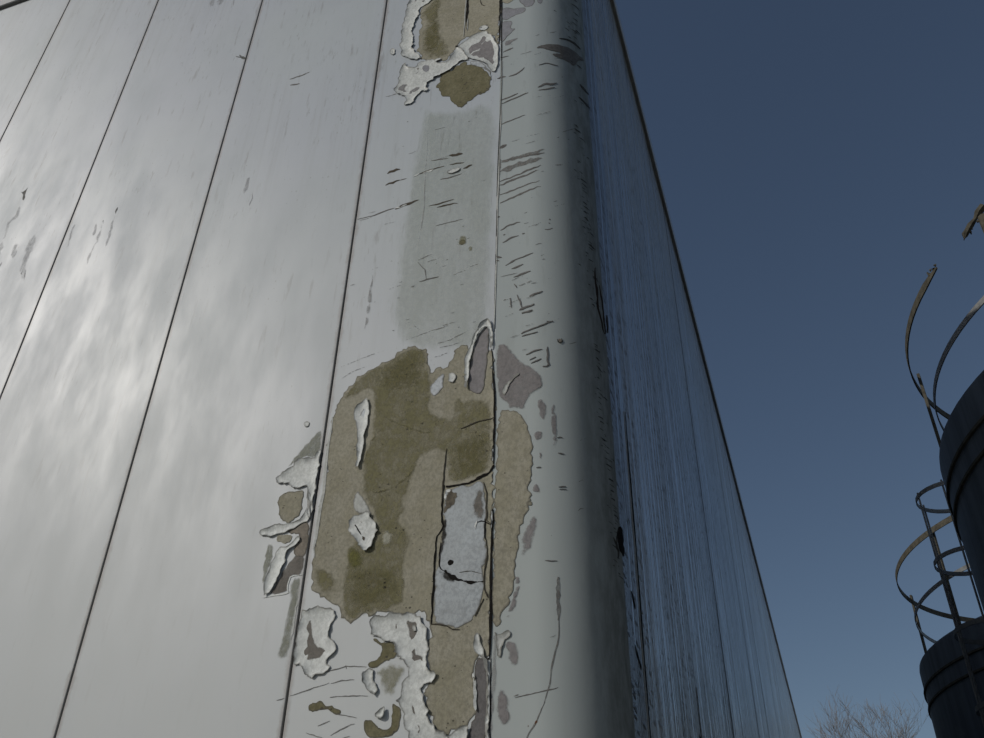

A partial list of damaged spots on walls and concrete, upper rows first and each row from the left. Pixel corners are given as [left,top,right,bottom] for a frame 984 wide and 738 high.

peeling [390,0,542,108]
crack [455,0,501,47]
peeling [259,318,556,738]
crack [431,349,496,659]